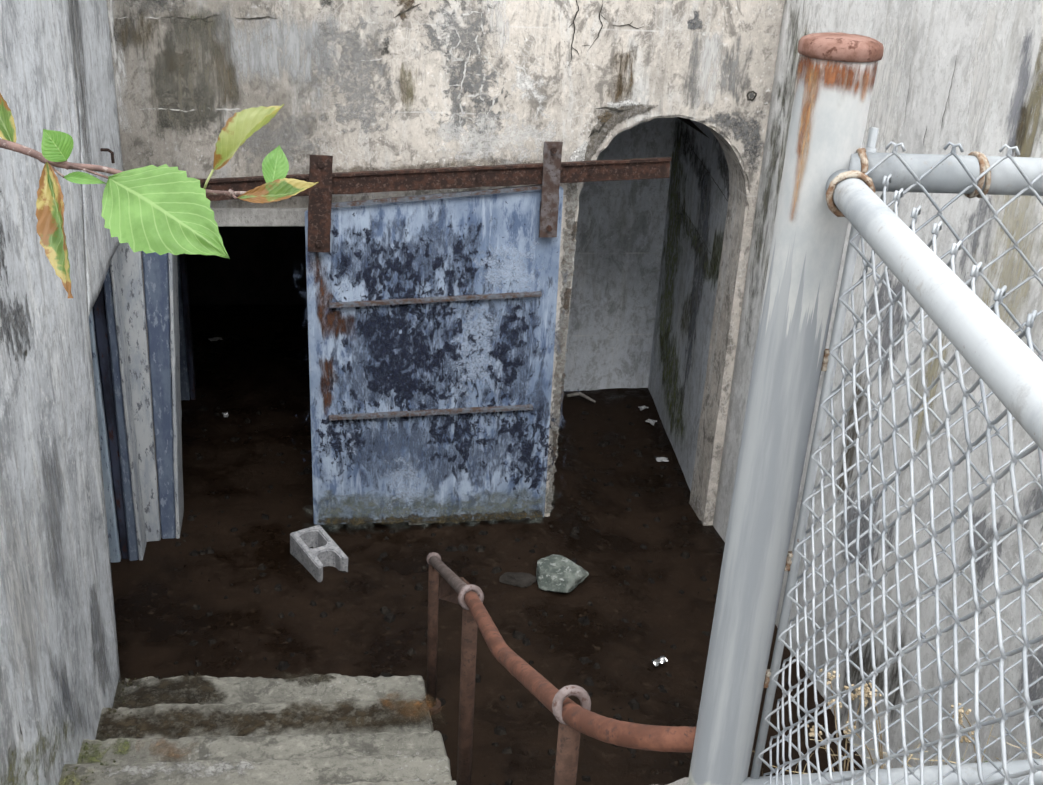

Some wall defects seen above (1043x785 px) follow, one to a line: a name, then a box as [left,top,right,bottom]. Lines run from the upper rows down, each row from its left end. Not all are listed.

damp [108,0,413,133]
crack [569,0,644,62]
rust [792,56,878,218]
damp [1008,33,1043,157]
damp [677,34,763,404]